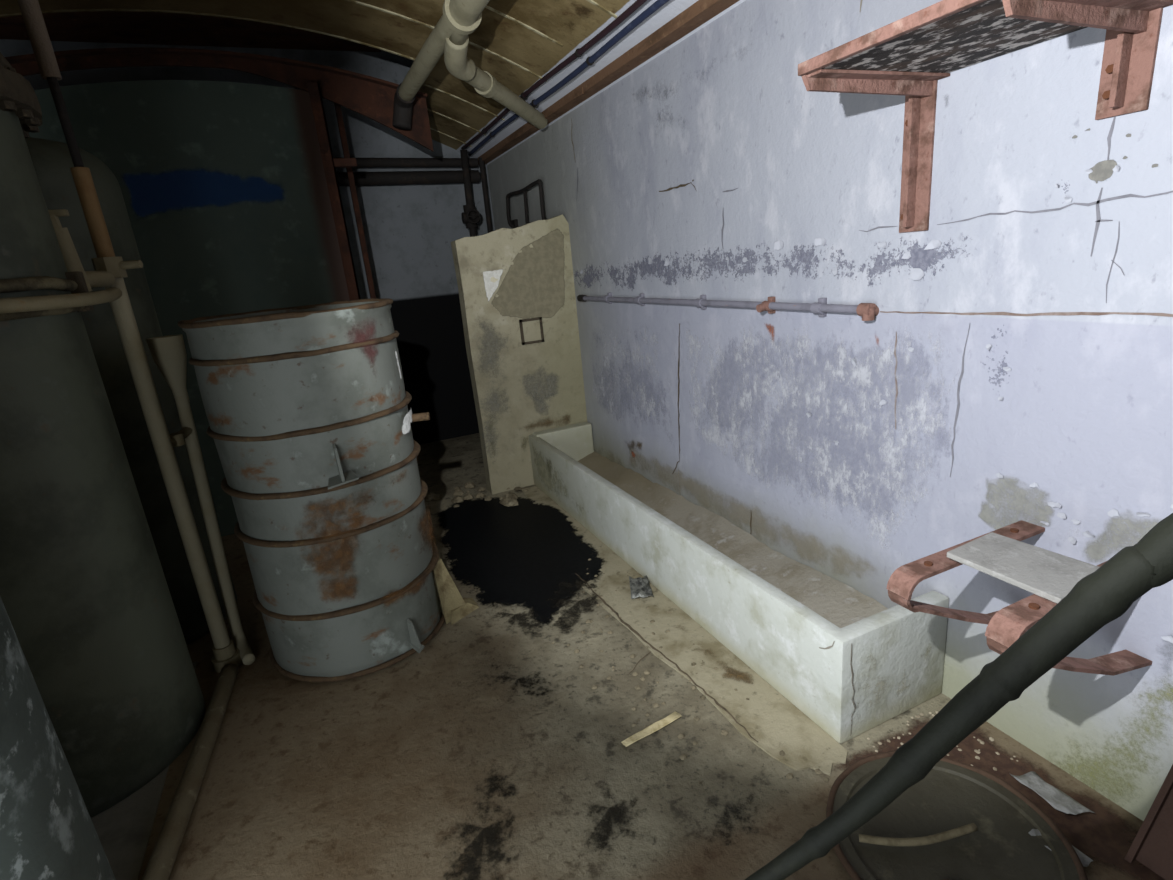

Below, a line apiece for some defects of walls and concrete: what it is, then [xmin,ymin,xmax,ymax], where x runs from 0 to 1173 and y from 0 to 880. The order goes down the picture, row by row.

crack [1107,116,1116,160]
spalling [483,229,967,319]
crack [859,225,897,233]
crack [880,188,1173,477]
crack [672,323,680,486]
peeling [687,331,939,543]
spalling [980,473,1157,560]
leakage [438,497,605,637]
crack [819,641,856,736]